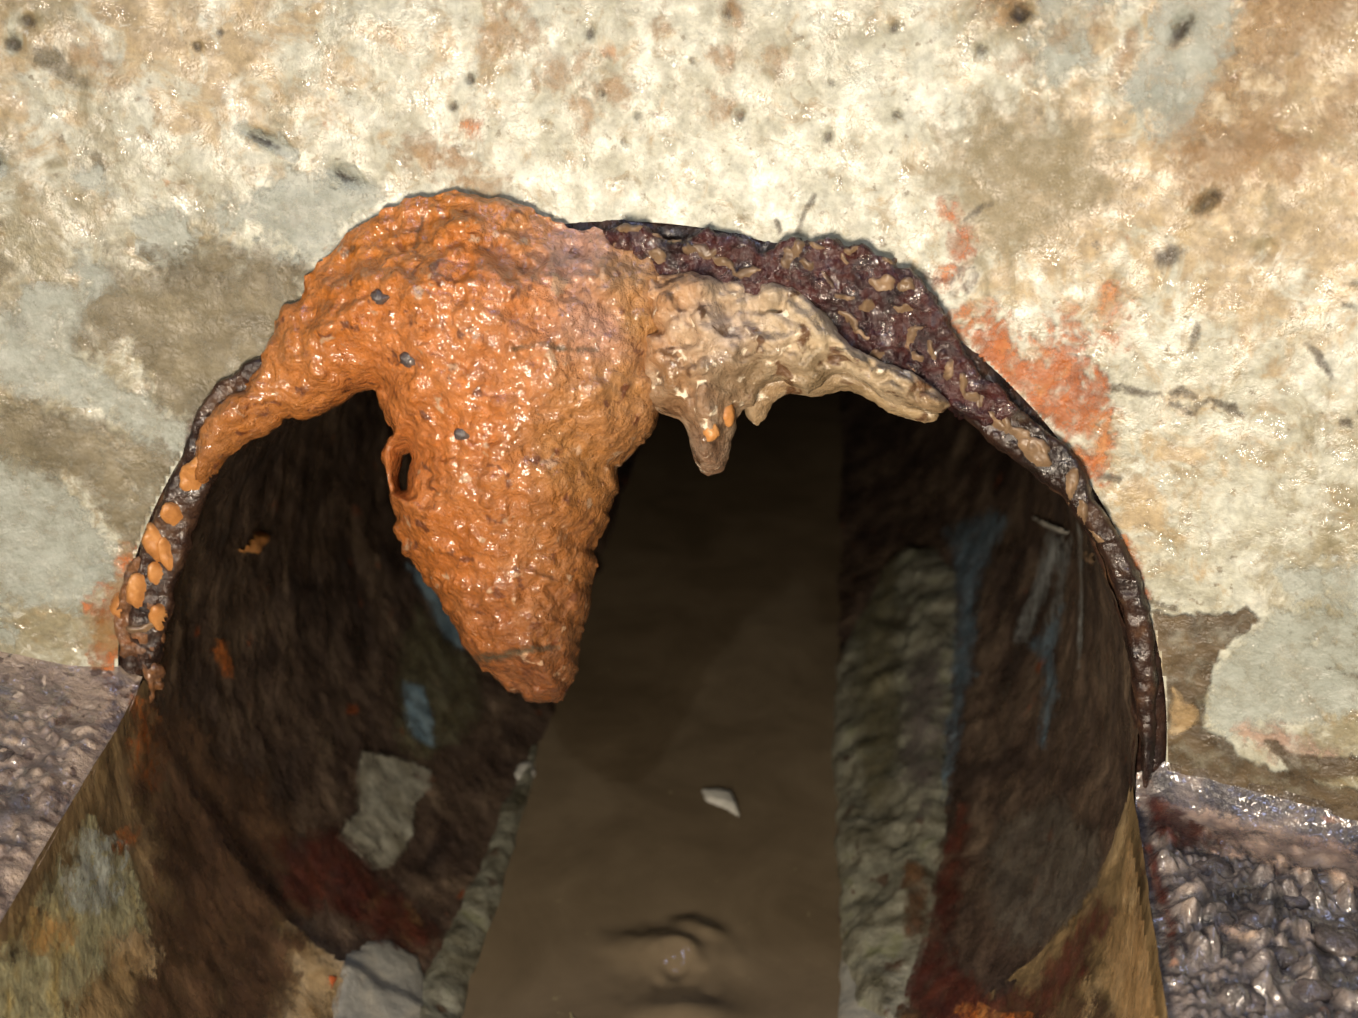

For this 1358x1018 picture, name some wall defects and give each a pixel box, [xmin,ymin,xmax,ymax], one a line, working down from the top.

corrosion [937,202,975,284]
water stain [0,400,179,548]
water stain [71,240,309,422]
corrosion [185,145,659,703]
corrosion [947,299,1118,486]
crack [1102,386,1242,416]
crack [1191,324,1199,341]
crack [1309,347,1330,376]
crack [1340,412,1358,427]
corrosion [900,797,1212,1018]